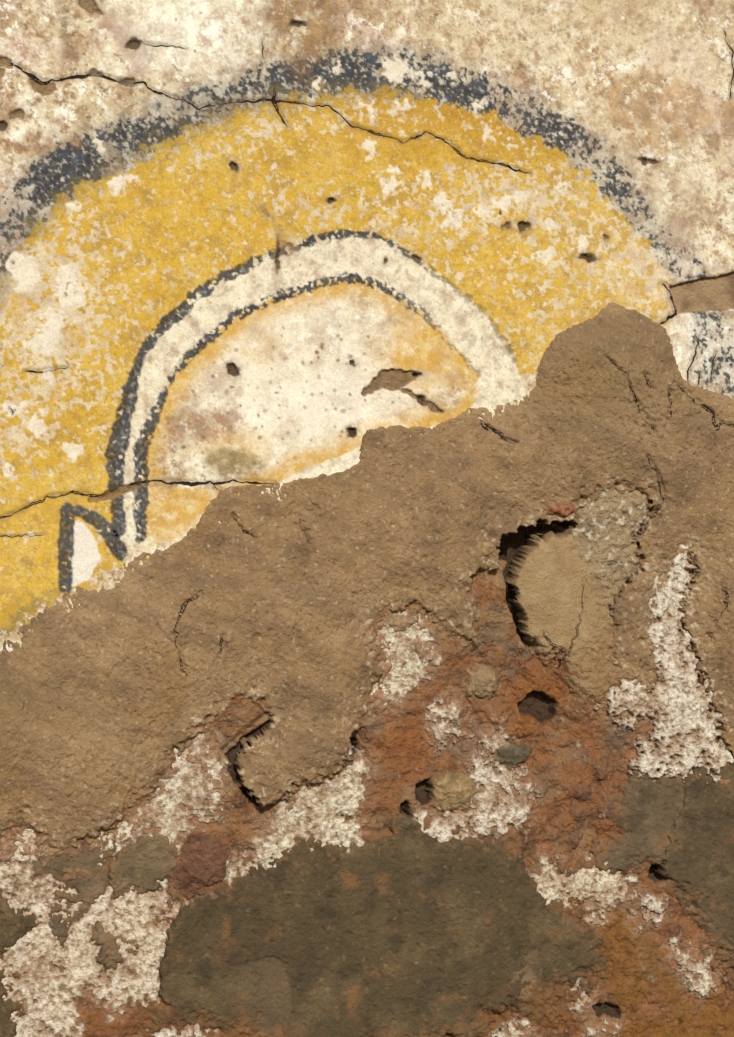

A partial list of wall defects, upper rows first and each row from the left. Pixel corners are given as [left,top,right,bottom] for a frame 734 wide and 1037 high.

crack [0,59,528,173]
peeling [6,252,40,293]
peeling [22,262,92,386]
spalling [227,363,240,377]
spalling [361,369,443,413]
peeling [2,400,48,438]
peeling [62,443,84,462]
crack [0,479,273,537]
spalling [497,489,653,706]
spalling [517,691,555,722]
spalling [224,720,271,805]
spalling [592,1002,621,1019]